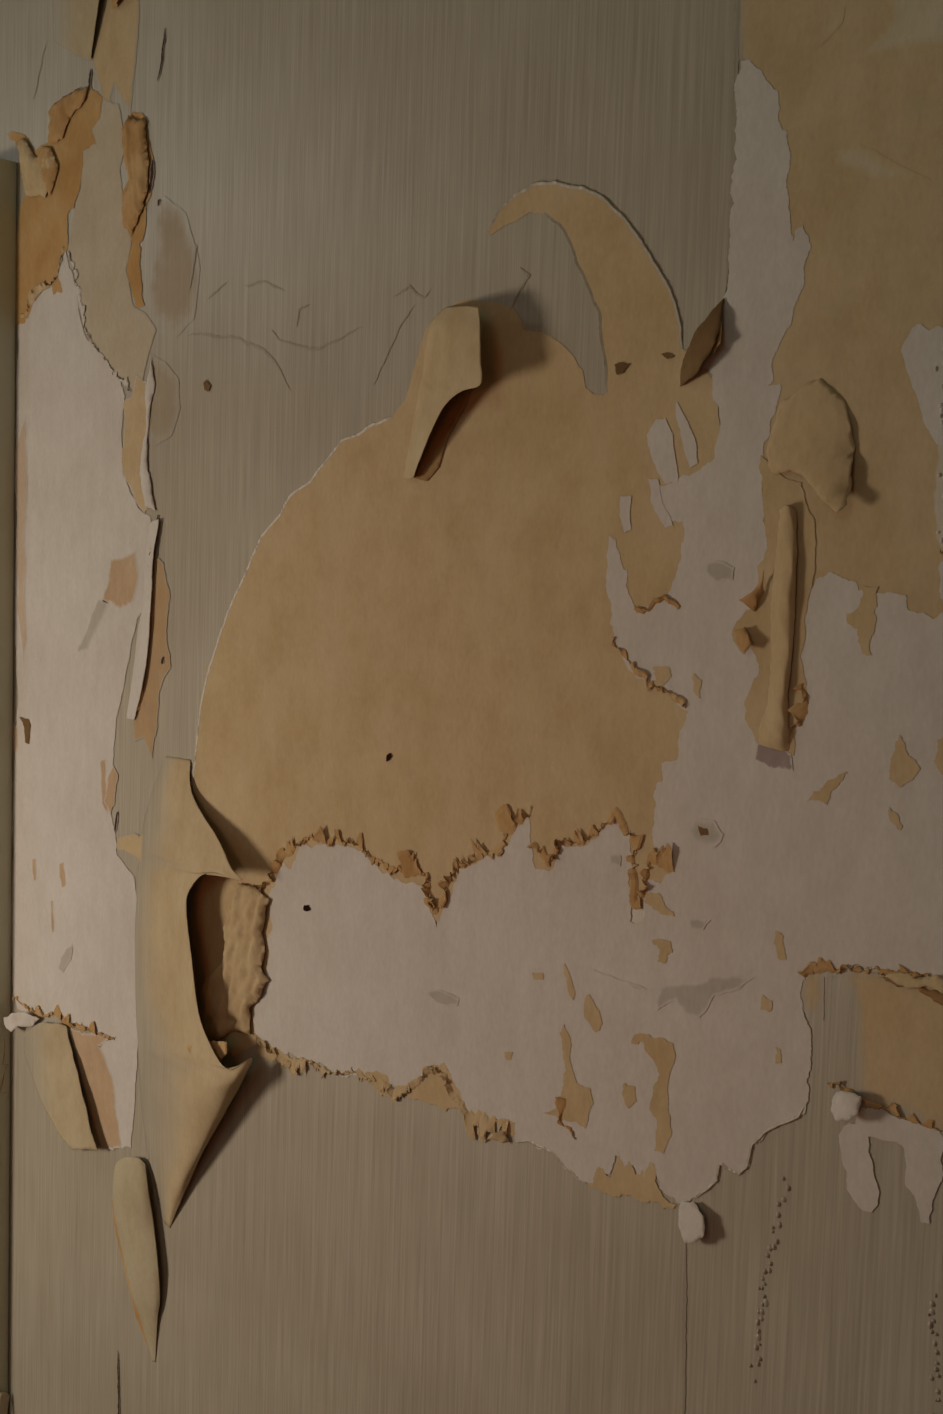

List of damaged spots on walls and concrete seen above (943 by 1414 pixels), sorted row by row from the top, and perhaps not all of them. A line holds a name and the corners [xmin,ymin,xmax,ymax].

peeling [112,1157,160,1362]
peeling [3,0,724,1228]
flaking render [253,0,943,1244]
water stain [755,739,793,771]